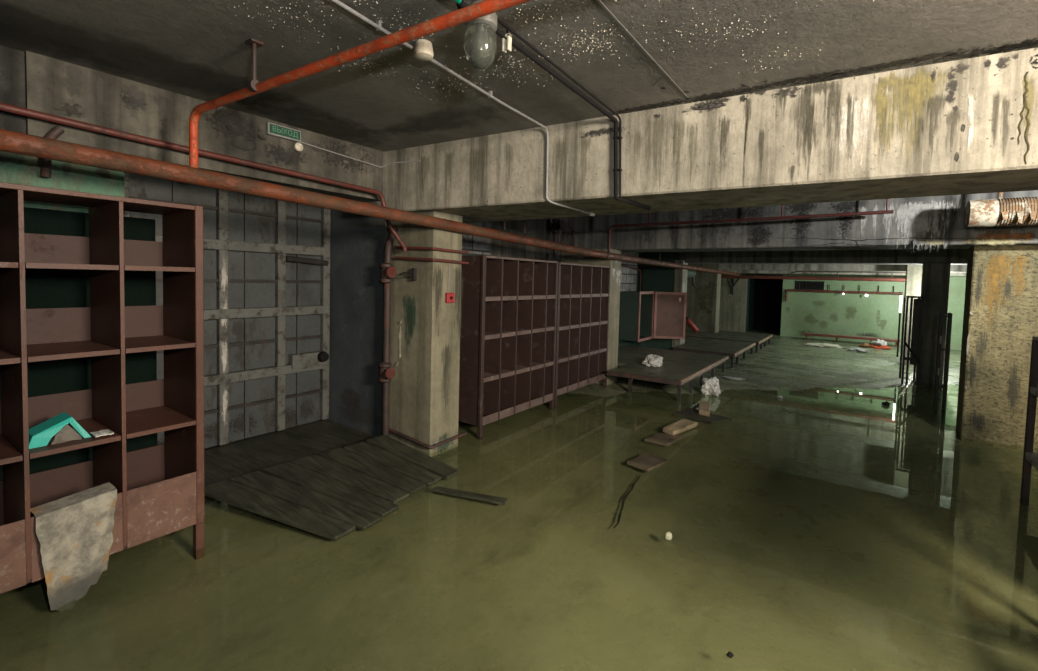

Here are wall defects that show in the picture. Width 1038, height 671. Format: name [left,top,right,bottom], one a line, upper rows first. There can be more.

damp [581,128,619,138]
damp [610,40,1038,172]
crack [1018,57,1038,164]
damp [700,206,773,247]
damp [785,199,961,247]
damp [966,226,1025,245]